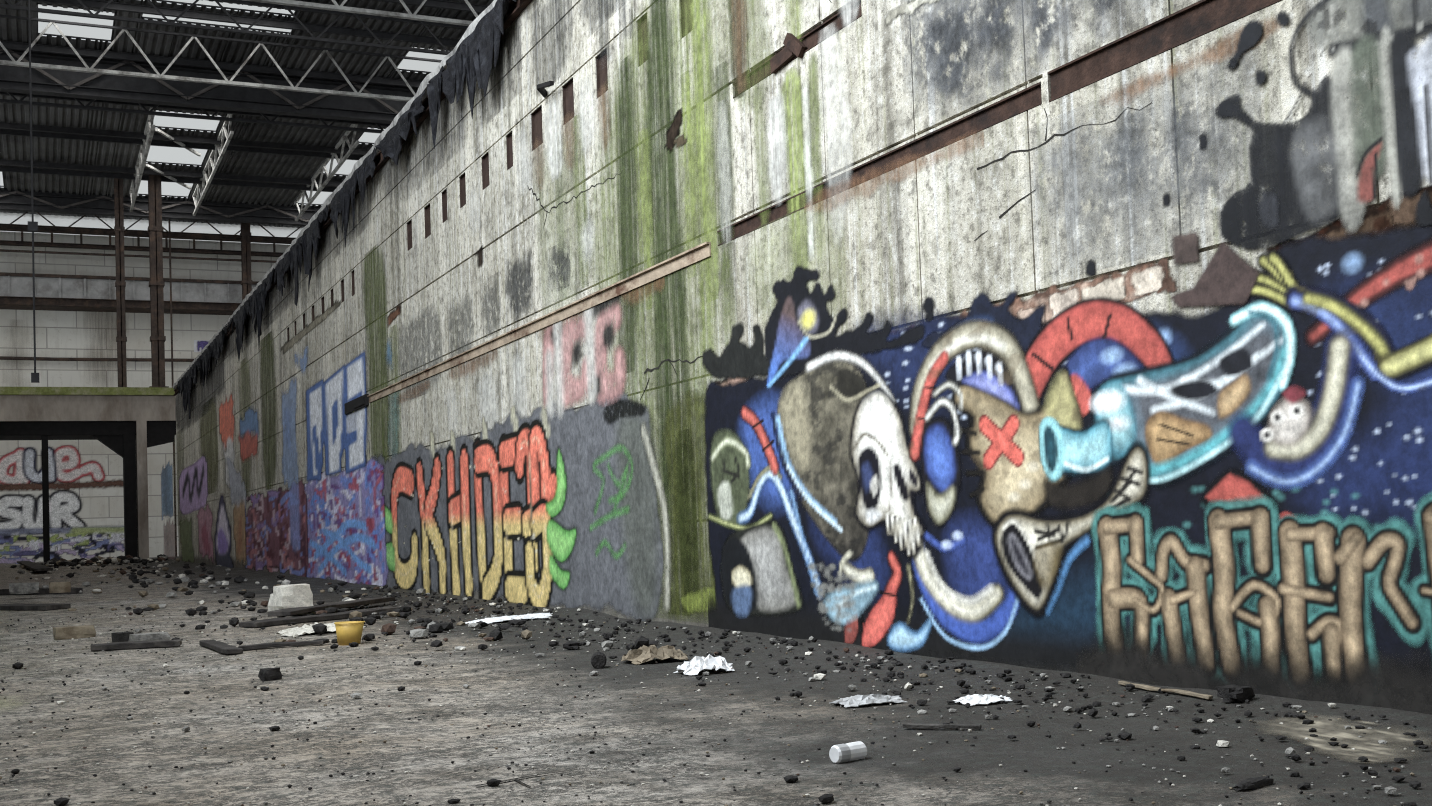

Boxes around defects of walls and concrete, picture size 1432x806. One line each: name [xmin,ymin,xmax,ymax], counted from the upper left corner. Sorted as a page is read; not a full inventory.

water stain [619,0,725,616]
flaking render [994,258,1176,324]